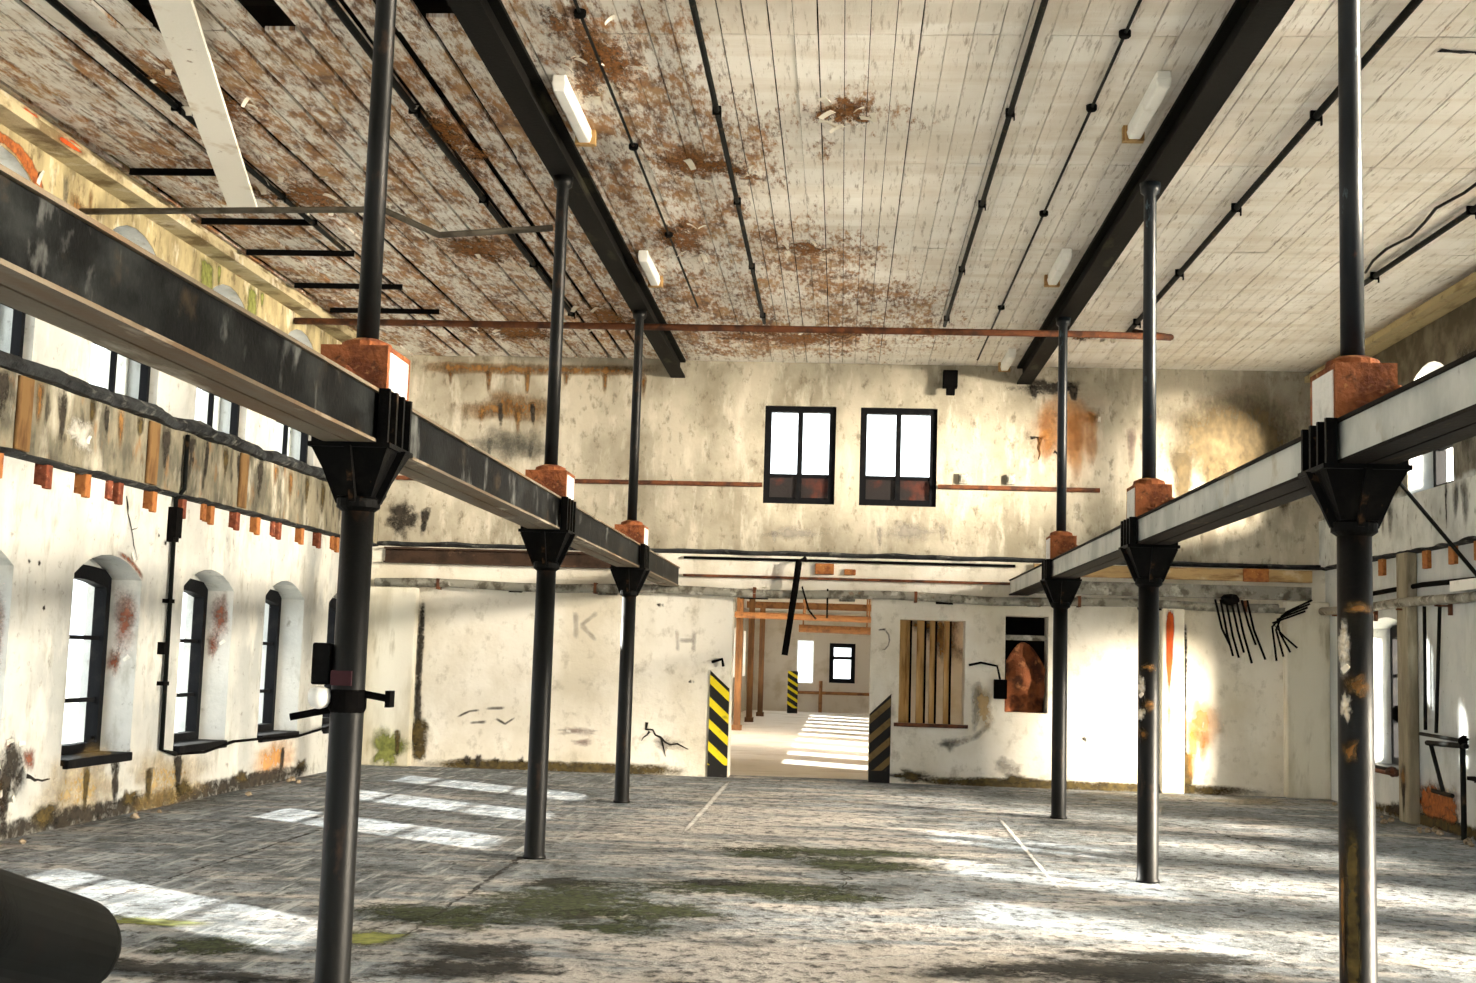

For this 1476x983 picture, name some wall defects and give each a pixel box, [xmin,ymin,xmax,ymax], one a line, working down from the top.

peeling [539,6,646,105]
peeling [220,80,267,139]
peeling [814,92,877,133]
flaking render [0,131,45,188]
rust [1044,412,1094,452]
leakage [1173,394,1295,497]
rust [1166,611,1174,724]
rust [1188,709,1210,769]
leakage [0,755,306,840]
leakage [1376,802,1399,819]
leakage [1420,813,1476,840]
rust [1341,832,1361,983]